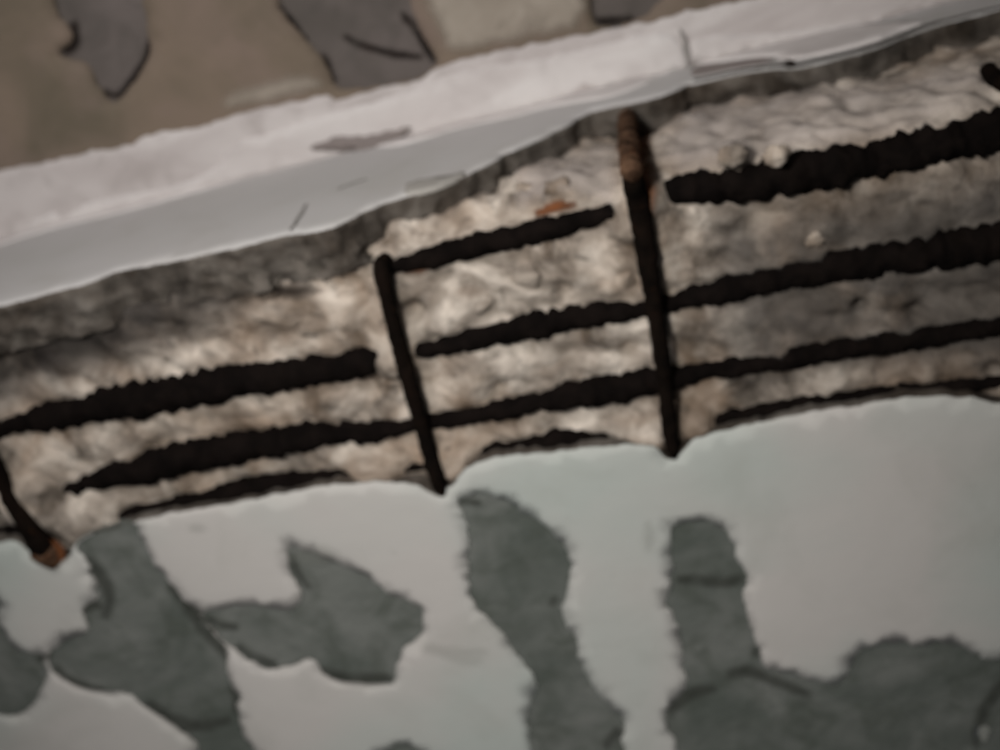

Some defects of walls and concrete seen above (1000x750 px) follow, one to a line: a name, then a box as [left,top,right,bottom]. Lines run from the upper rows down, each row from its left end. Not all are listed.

flaking render [0,0,956,245]
spalling [640,36,1000,295]
spalling [0,137,666,750]
spalling [665,302,794,366]
spalling [674,345,1000,443]
spalling [809,272,930,344]
peeling [666,520,1000,750]